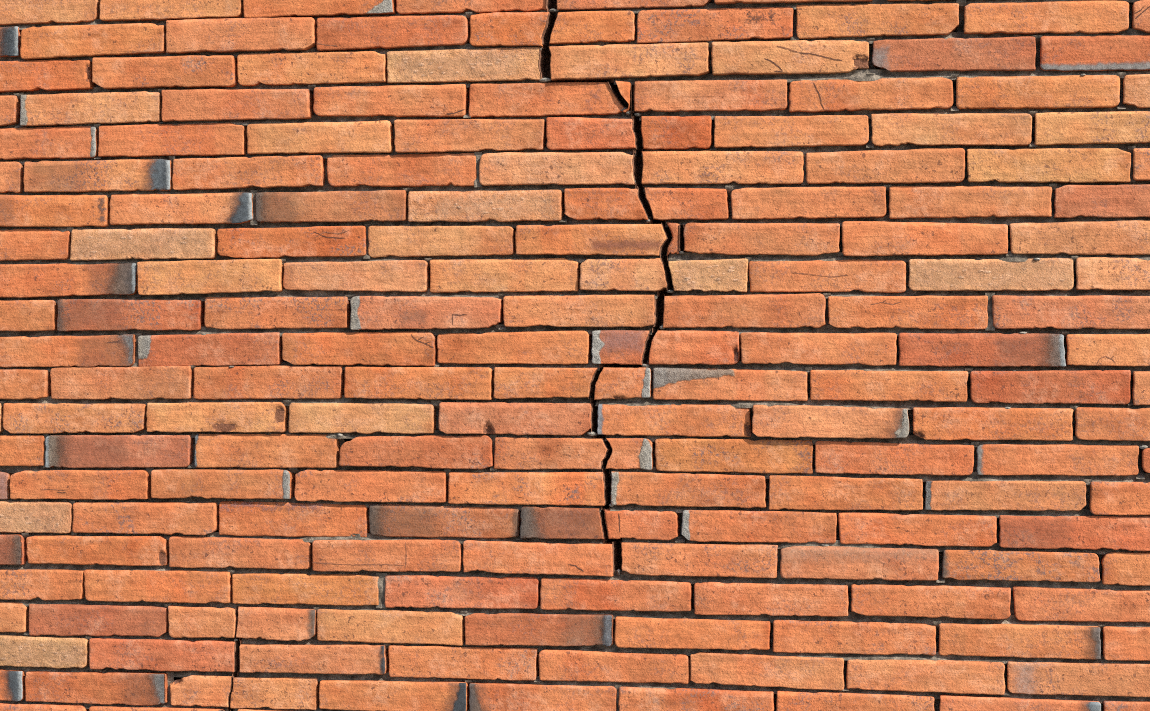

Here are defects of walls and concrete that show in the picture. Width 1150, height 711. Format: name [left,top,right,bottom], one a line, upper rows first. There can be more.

crack [539,0,559,83]
crack [587,78,686,575]